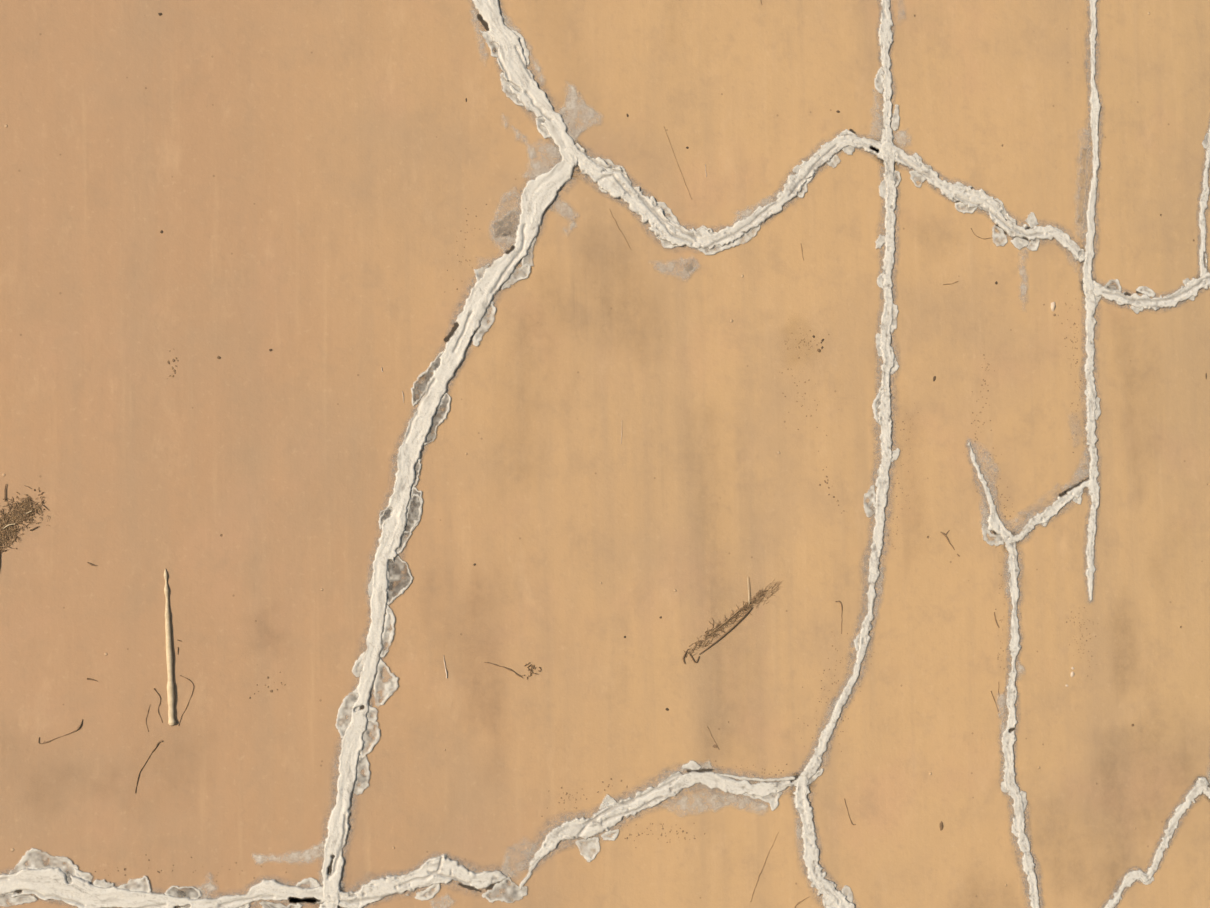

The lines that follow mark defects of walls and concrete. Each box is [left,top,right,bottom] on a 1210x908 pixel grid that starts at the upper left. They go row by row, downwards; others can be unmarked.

crack [0,146,901,908]
crack [472,0,1210,908]